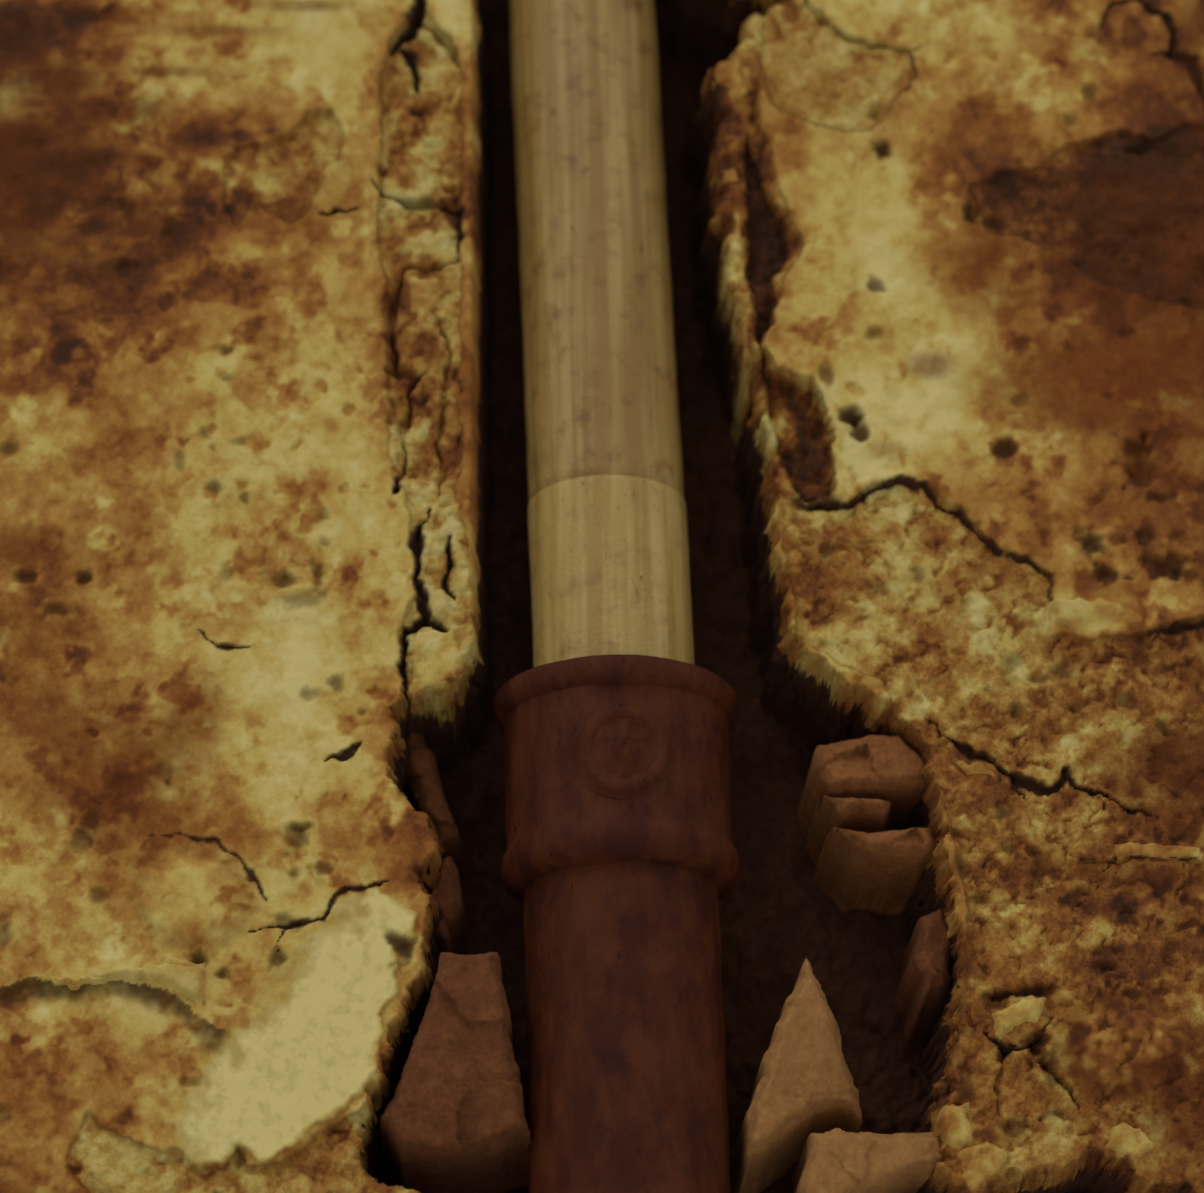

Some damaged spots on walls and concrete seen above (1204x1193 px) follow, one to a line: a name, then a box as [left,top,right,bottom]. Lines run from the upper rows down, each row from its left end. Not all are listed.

crack [1100,0,1204,100]
spalling [377,10,480,742]
crack [800,475,1052,601]
spalling [706,0,1204,1193]
crack [1148,620,1204,637]
crack [928,720,1151,817]
crack [150,833,387,952]
spalling [67,1112,420,1193]